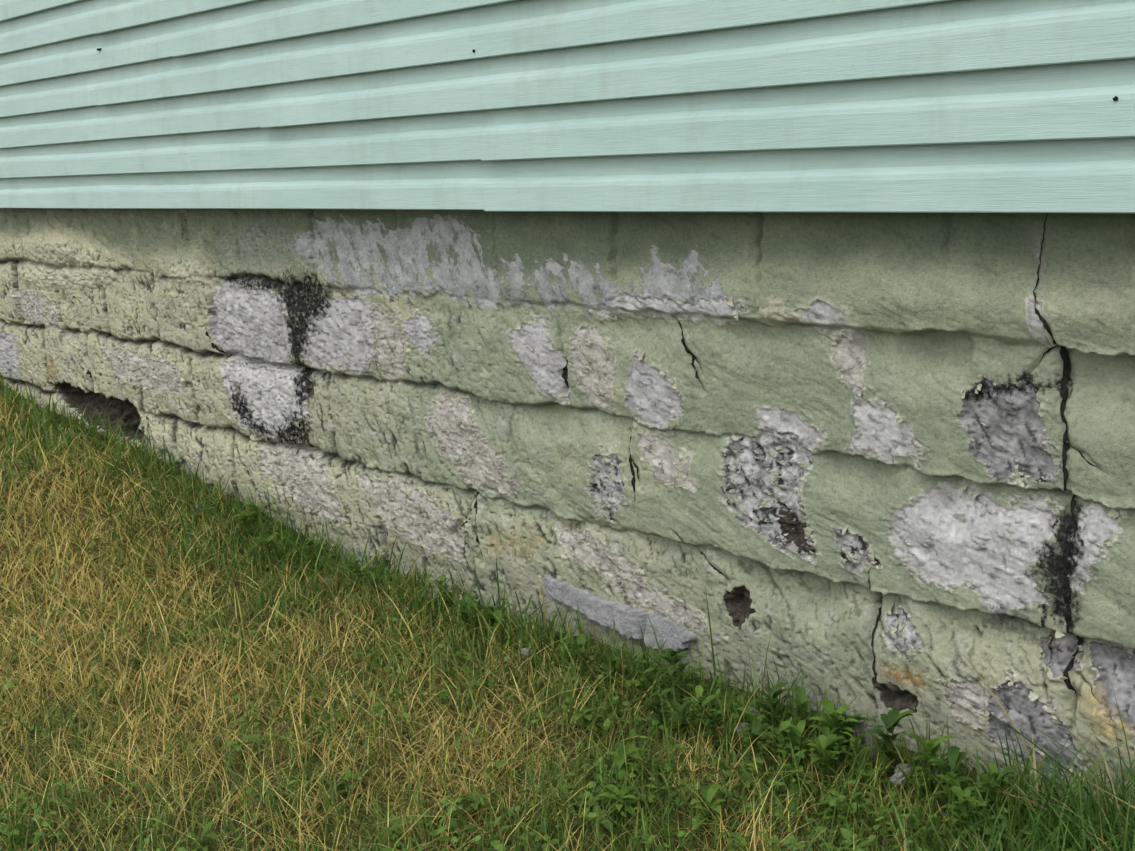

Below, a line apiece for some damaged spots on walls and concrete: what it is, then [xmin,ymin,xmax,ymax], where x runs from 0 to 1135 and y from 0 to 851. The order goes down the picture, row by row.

spalling [47,342,188,443]
water stain [219,227,333,453]
peeling [208,212,747,523]
crack [677,321,705,390]
spalling [720,405,827,564]
peeling [788,299,929,468]
peeling [832,377,1063,613]
crack [1032,213,1103,707]
peeling [1067,504,1127,595]
spalling [1039,630,1135,748]